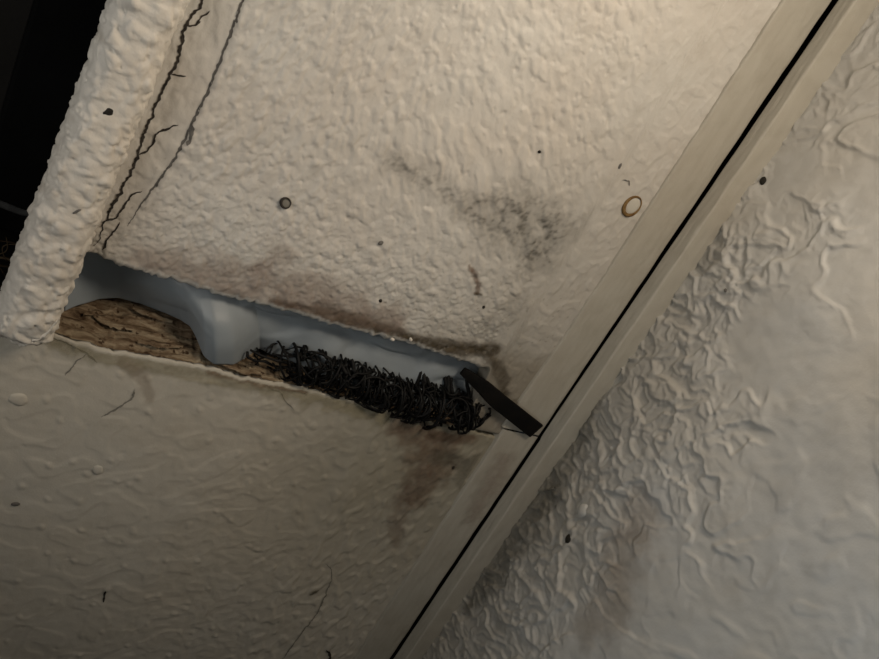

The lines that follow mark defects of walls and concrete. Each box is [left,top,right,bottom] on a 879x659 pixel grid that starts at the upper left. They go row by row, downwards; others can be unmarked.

spalling [1,298,459,425]